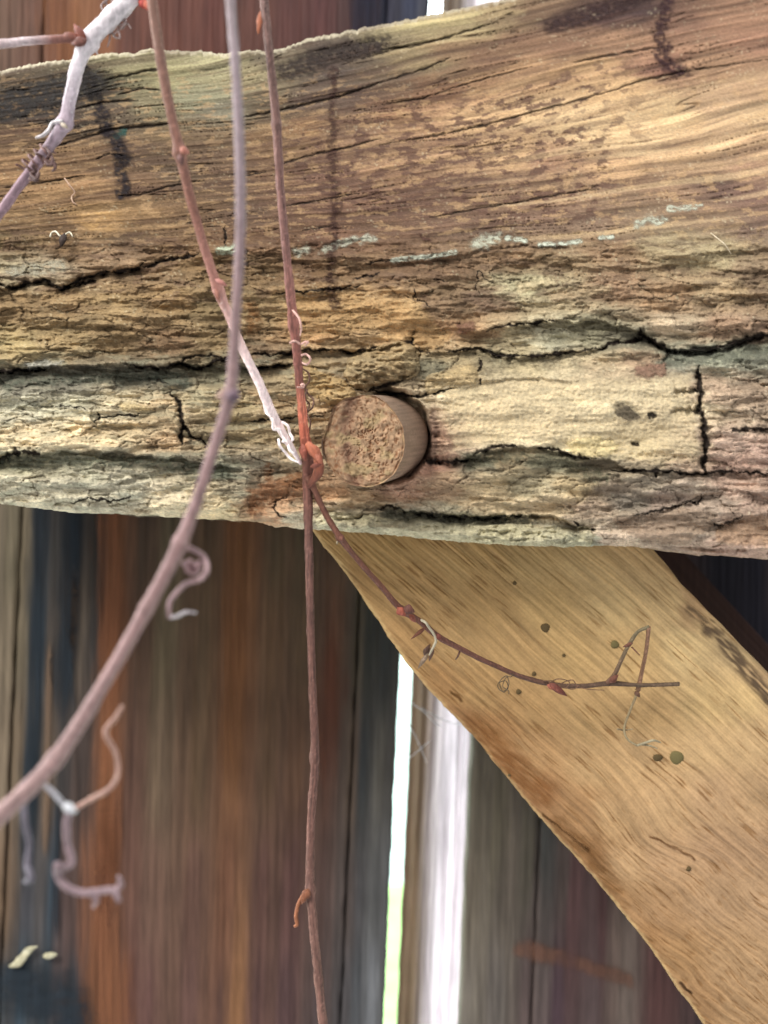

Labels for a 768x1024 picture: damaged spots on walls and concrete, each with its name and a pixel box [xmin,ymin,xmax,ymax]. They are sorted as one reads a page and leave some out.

damp [654,0,685,76]
damp [0,77,67,125]
damp [77,66,131,199]
crack [0,253,199,292]
crack [130,346,376,446]
crack [404,320,768,527]
crack [379,504,522,520]